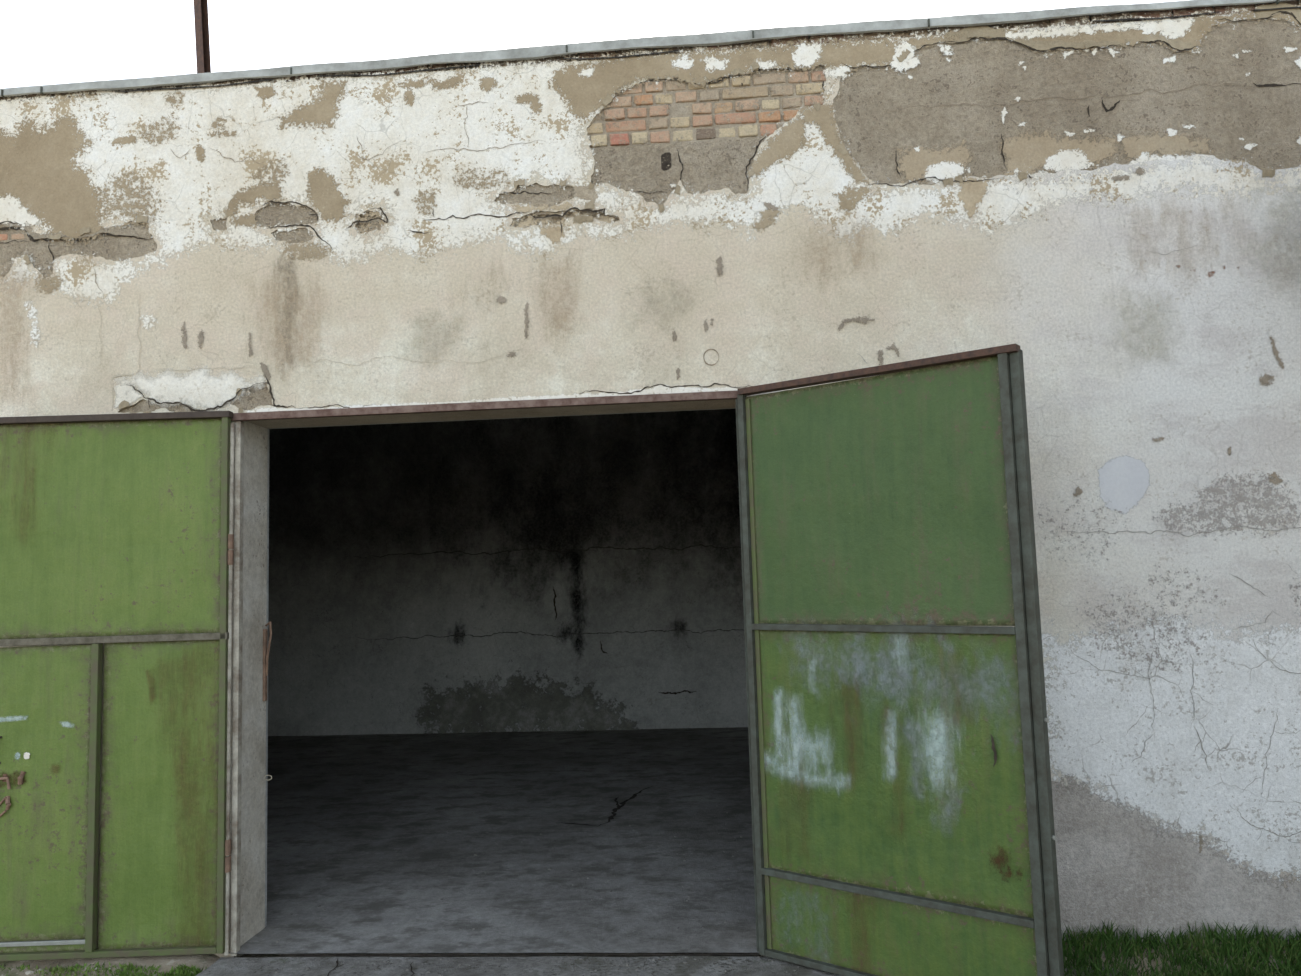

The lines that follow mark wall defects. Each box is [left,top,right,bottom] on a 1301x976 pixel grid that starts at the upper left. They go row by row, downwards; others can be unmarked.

flaking render [112,89,185,149]
flaking render [398,74,498,106]
crack [745,136,766,188]
flaking render [447,5,1301,244]
crack [649,1,1301,91]
crack [866,83,1300,186]
flaking render [0,110,164,348]
flaking render [114,383,207,413]
flaking render [226,332,273,413]
water stain [415,670,638,734]
crack [1069,643,1216,767]
crack [1230,713,1301,843]